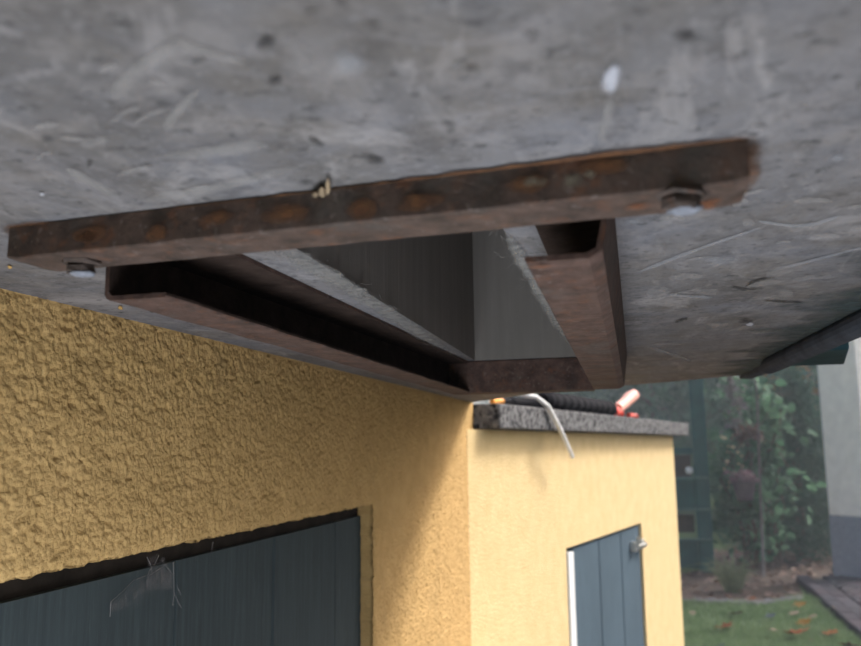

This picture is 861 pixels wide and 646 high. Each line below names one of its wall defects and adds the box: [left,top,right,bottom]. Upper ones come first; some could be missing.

rust [358,141,713,187]